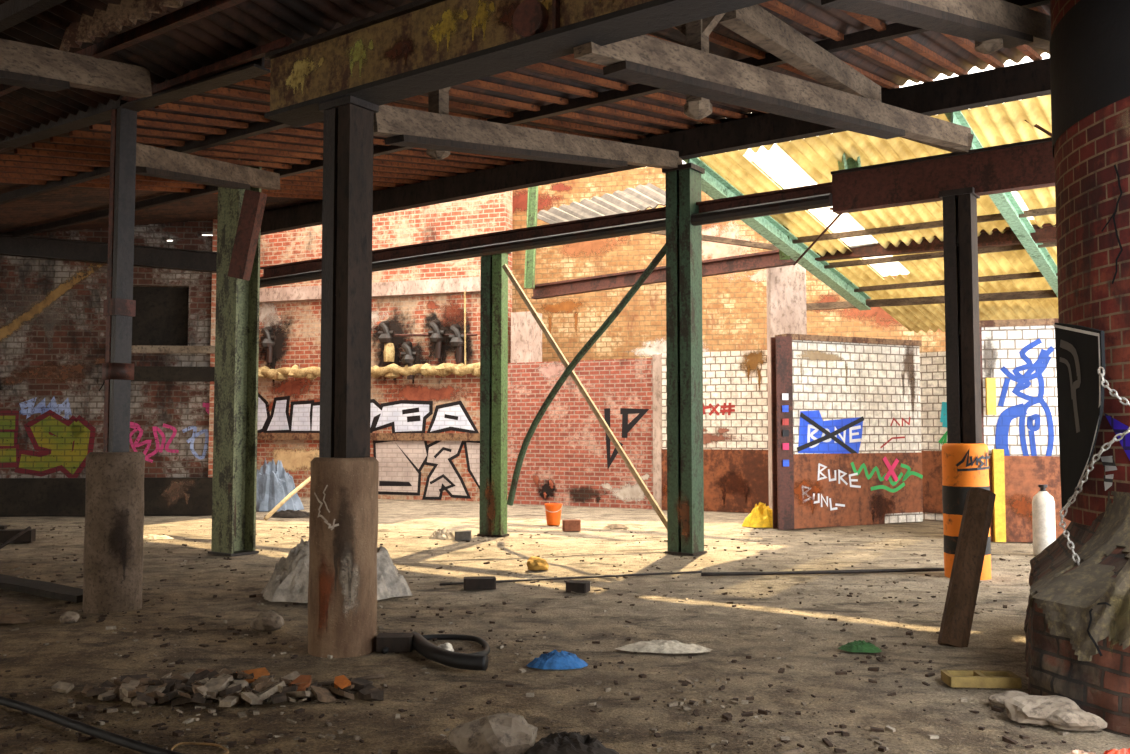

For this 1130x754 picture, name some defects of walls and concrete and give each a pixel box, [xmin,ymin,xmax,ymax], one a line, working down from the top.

rust [380,38,414,66]
rust [661,449,690,541]
rust [703,449,769,513]